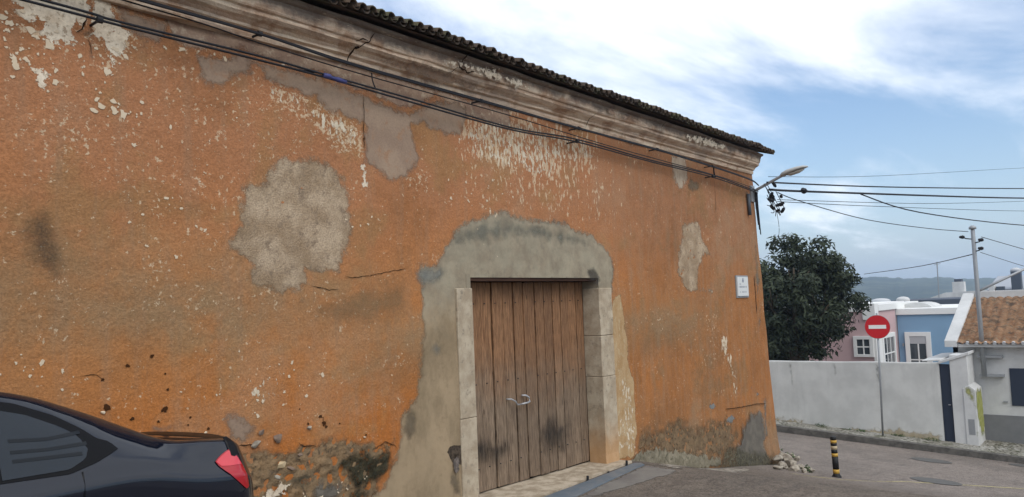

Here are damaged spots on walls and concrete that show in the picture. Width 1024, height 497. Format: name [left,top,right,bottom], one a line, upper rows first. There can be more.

peeling [0,0,144,119]
crack [346,33,375,66]
peeling [459,119,592,202]
crack [313,269,403,291]
peeling [612,295,738,460]
spalling [243,361,390,497]
spalling [447,445,461,473]